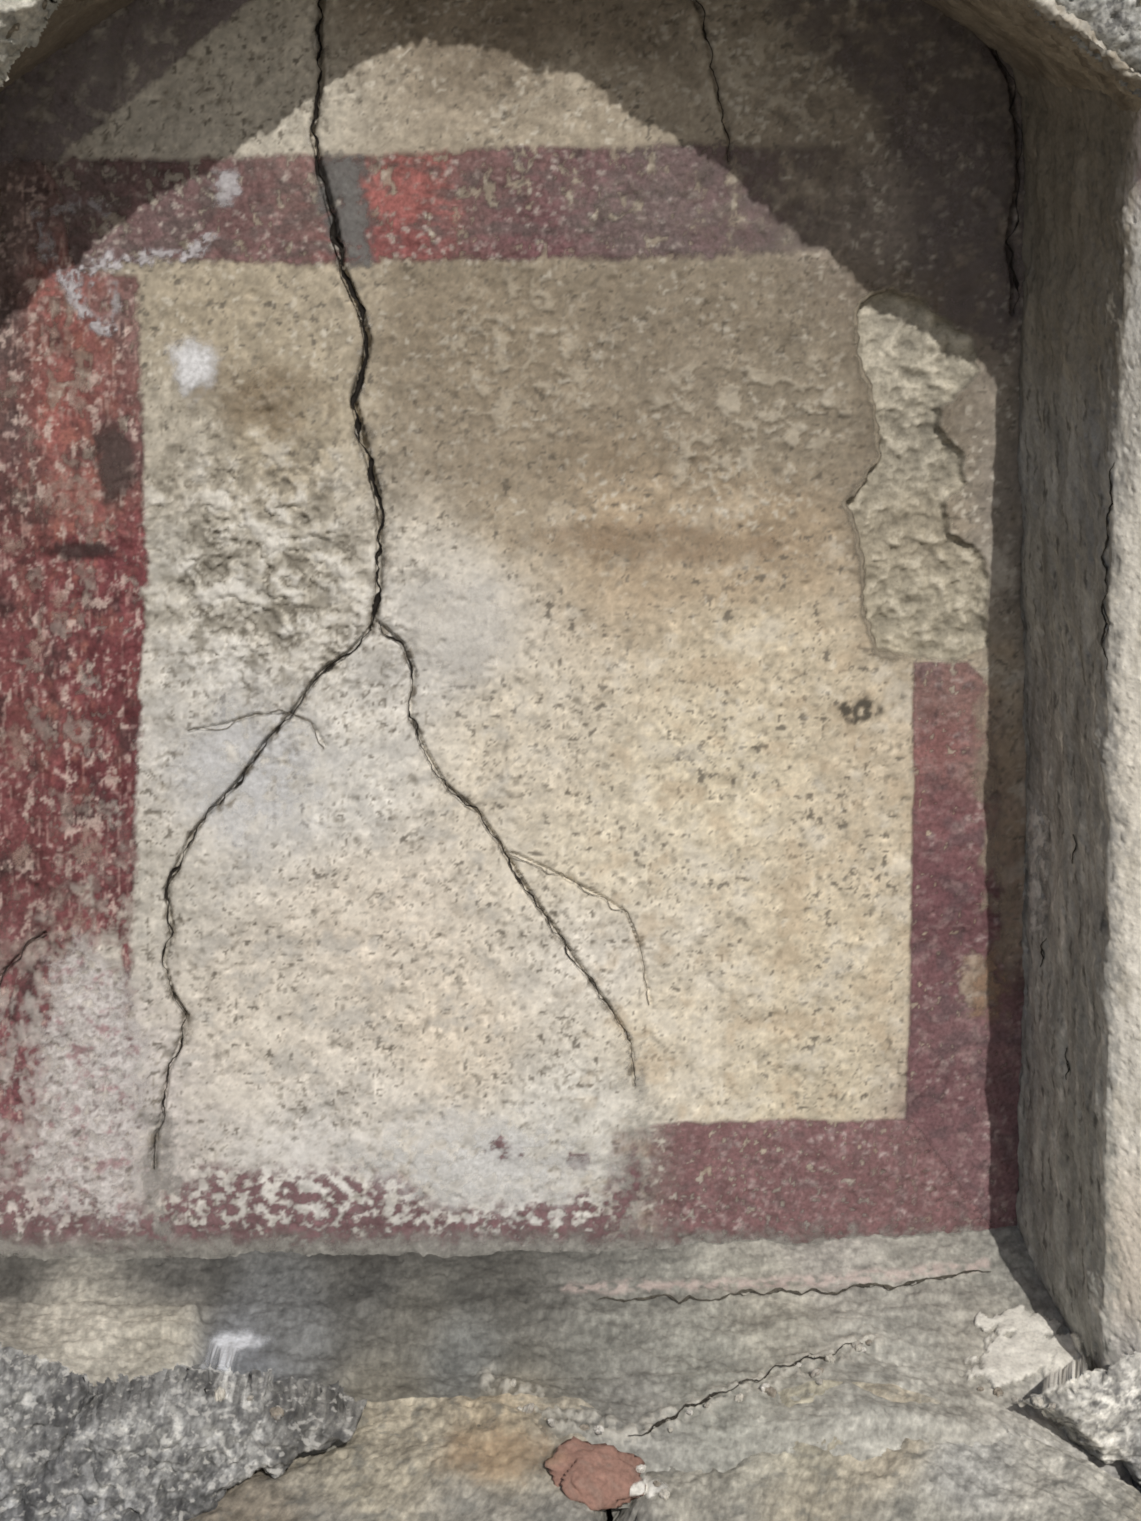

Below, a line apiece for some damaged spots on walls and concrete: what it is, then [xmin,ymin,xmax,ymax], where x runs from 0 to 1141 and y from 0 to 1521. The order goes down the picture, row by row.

crack [695,0,730,162]
flaking render [841,286,989,661]
crack [149,0,649,1170]
crack [597,1270,991,1304]
crack [628,1343,863,1436]